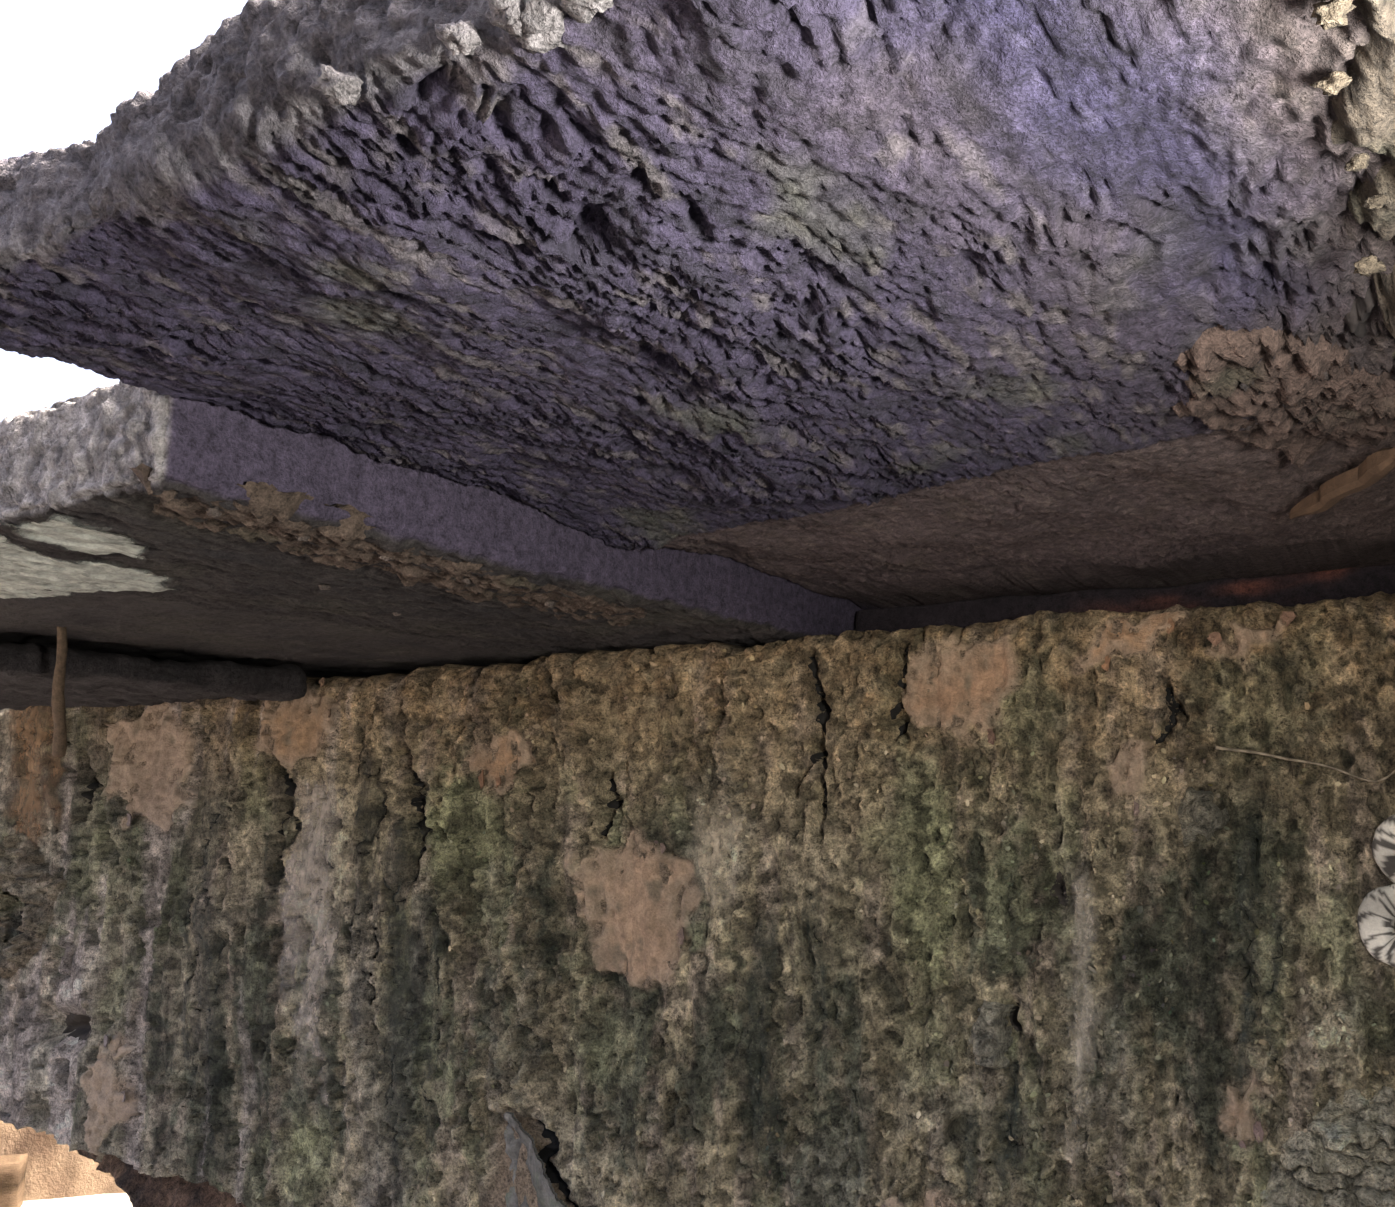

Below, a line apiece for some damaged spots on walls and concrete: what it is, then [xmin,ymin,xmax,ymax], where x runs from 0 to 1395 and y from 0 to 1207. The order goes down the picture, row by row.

peeling [901,628,1021,751]
damp [181,799,225,1078]
damp [283,752,441,1096]
peeling [563,829,703,1004]
damp [698,814,743,906]
damp [1237,827,1283,1079]
peeling [503,1112,579,1207]